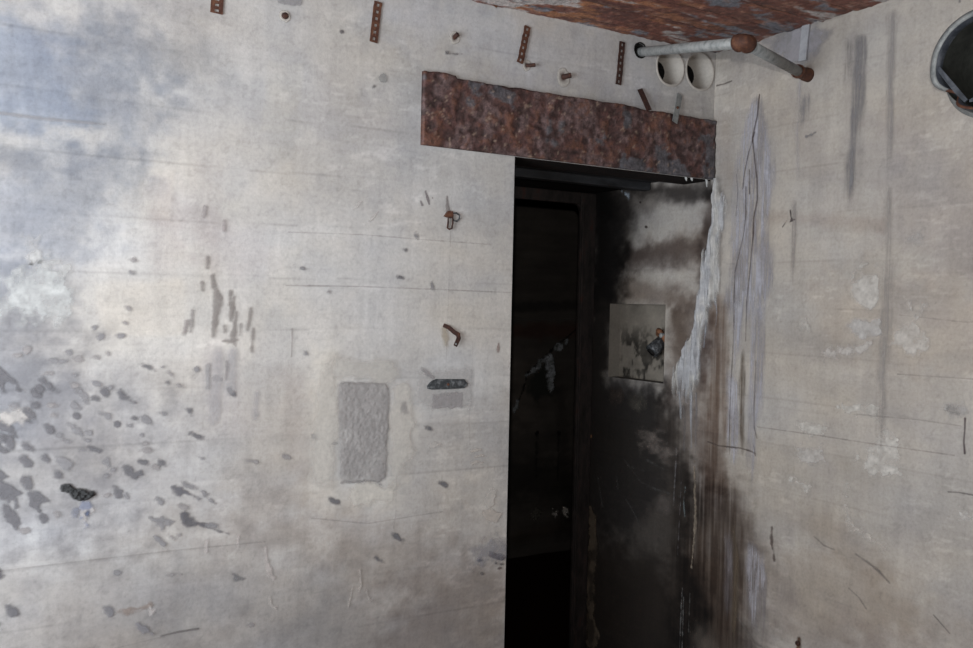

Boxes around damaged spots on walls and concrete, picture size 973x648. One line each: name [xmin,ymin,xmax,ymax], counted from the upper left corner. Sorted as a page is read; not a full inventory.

peeling [0,412,28,424]
peeling [8,250,71,316]
damp [672,178,724,431]
damp [728,100,773,458]